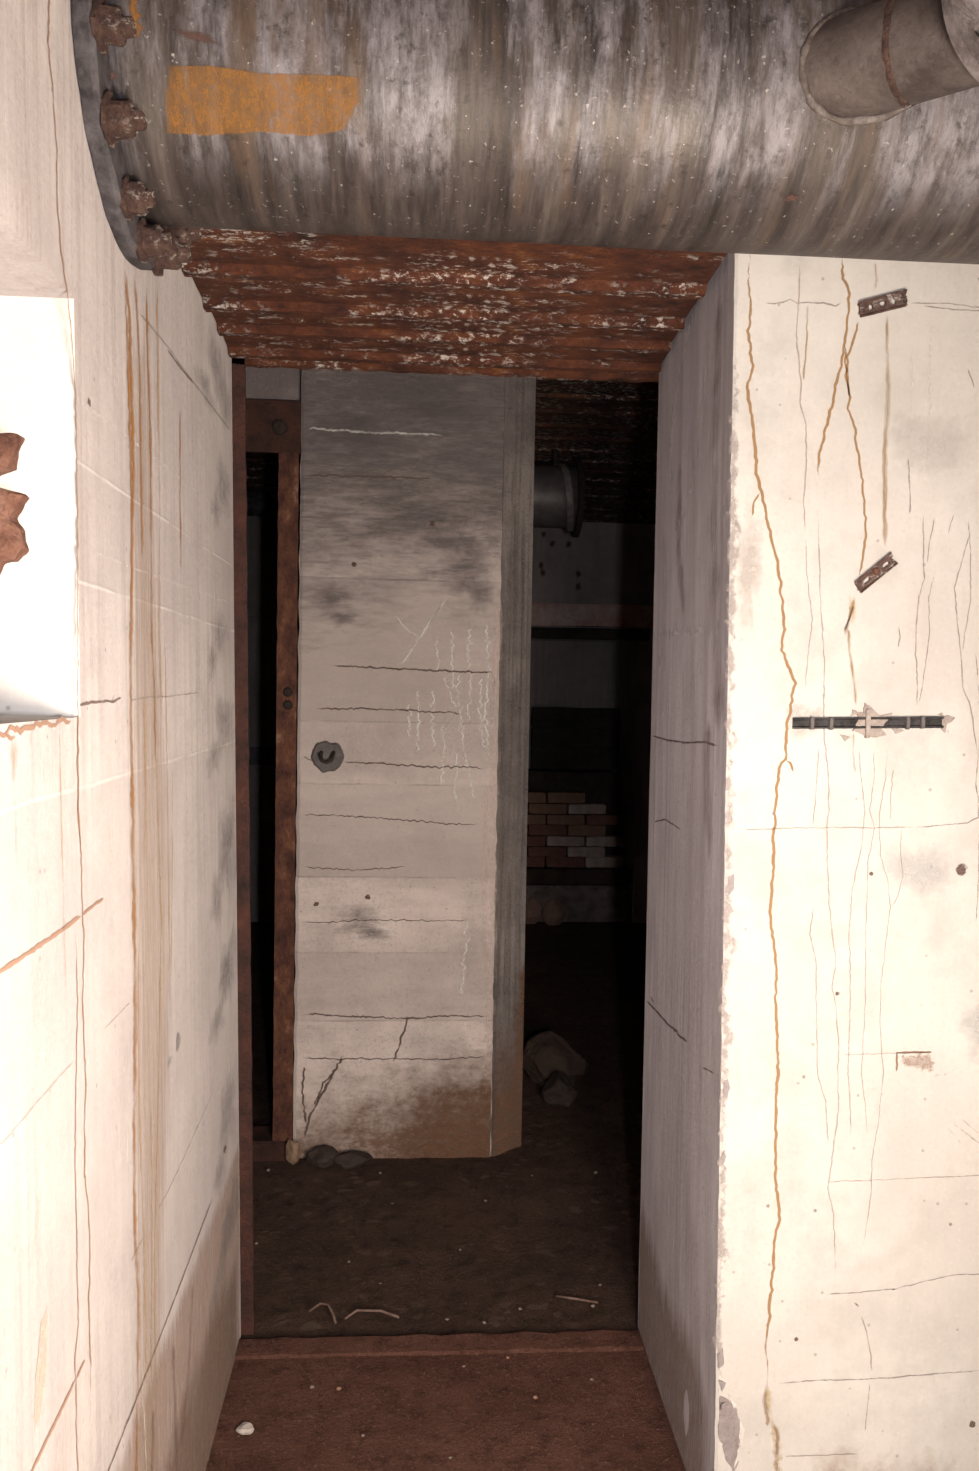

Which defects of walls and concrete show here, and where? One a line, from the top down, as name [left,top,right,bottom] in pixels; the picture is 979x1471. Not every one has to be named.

corrosion [130,0,142,36]
crack [0,0,210,1471]
corrosion [126,284,173,1361]
crack [746,265,979,1415]
crack [301,1013,483,1134]
damp [297,973,524,1159]
peeling [718,1347,745,1471]